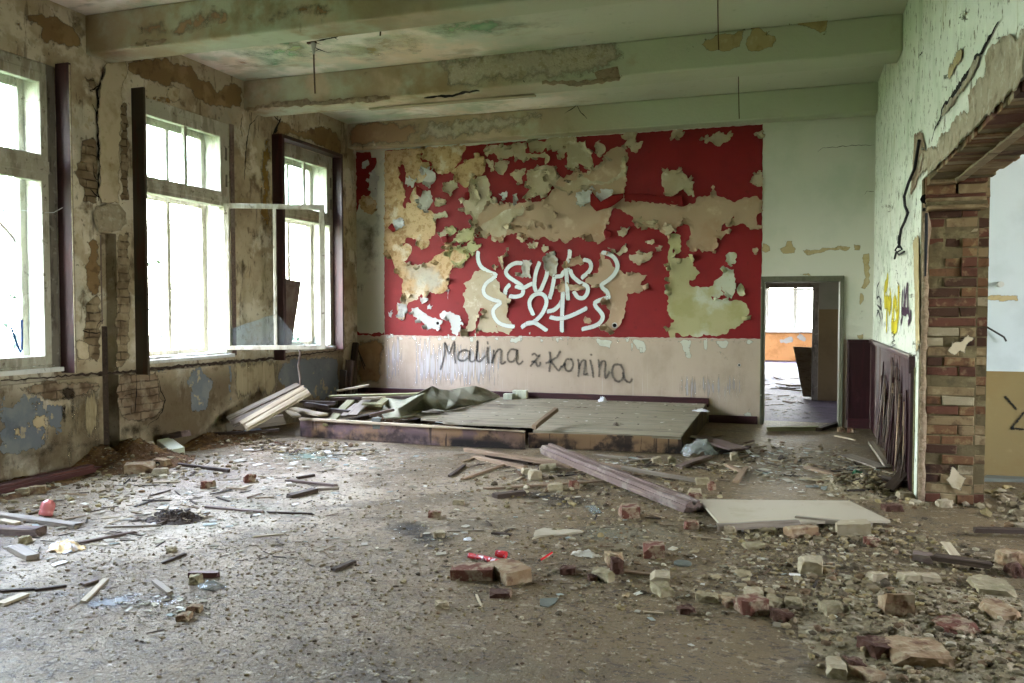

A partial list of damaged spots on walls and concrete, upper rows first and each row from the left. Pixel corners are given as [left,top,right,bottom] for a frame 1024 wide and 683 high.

flaking render [17,14,81,47]
flaking render [75,137,98,203]
crack [90,67,104,201]
flaking render [128,38,390,111]
crack [424,90,479,98]
flaking render [542,66,621,87]
peeling [702,28,776,52]
flaking render [909,29,1024,196]
peeling [359,131,764,338]
flaking render [83,239,102,361]
flaking render [115,232,165,421]
flaking render [752,241,870,305]